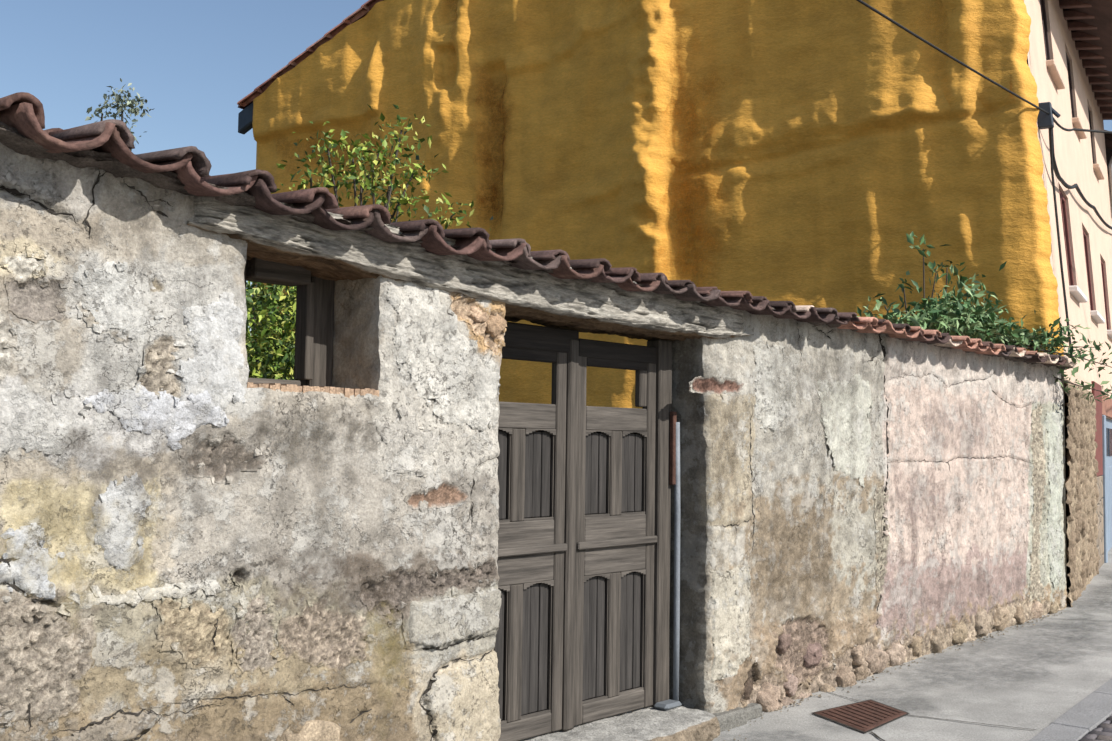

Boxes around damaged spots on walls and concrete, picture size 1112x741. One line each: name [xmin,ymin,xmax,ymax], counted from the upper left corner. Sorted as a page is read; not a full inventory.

crack [0,168,173,239]
peeling [0,242,267,484]
peeling [368,281,507,512]
peeling [689,342,800,433]
peeling [92,472,151,574]
crack [868,334,1064,627]
crack [26,683,372,741]
spalling [0,522,502,741]
crack [400,598,495,741]